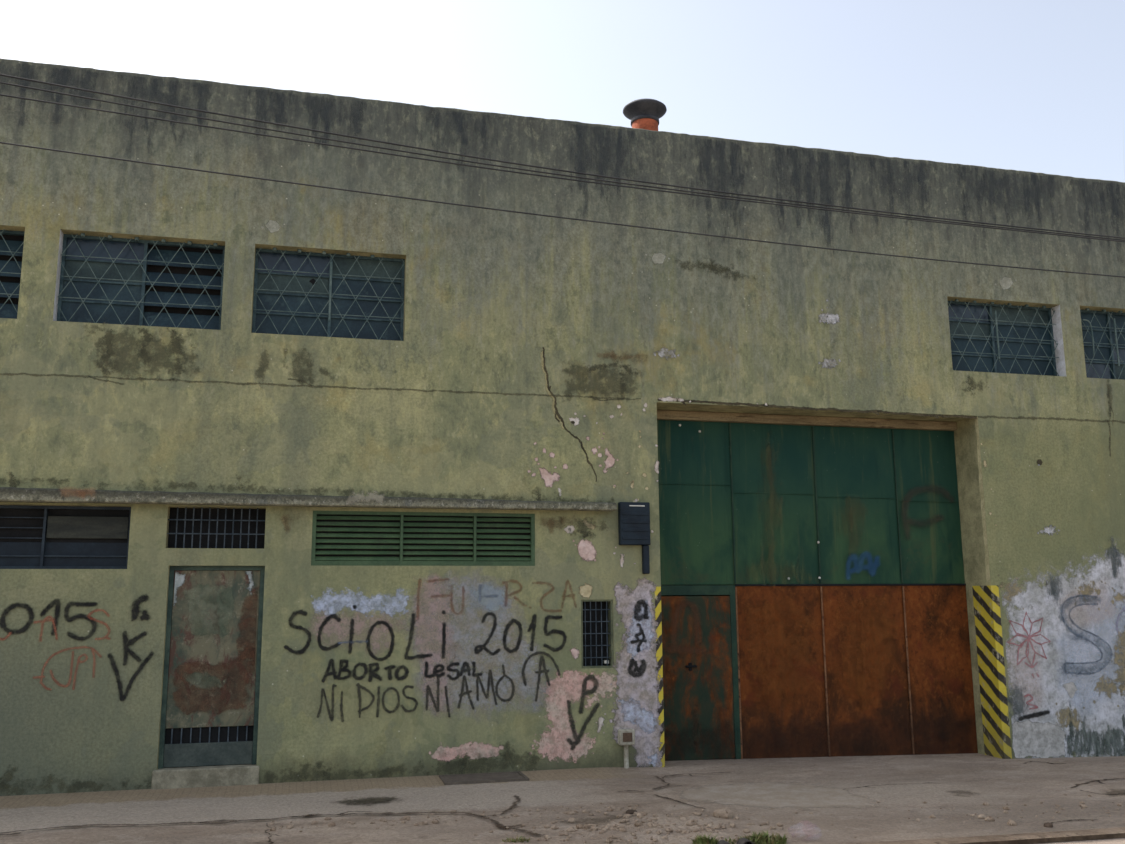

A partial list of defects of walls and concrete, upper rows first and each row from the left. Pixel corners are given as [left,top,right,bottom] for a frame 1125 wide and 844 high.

damp [89,326,197,375]
damp [565,363,638,399]
crack [3,347,641,482]
flaking render [528,442,568,496]
flaking render [569,412,618,473]
flaking render [626,444,659,502]
peeling [312,576,663,767]
peeling [1002,550,1125,758]